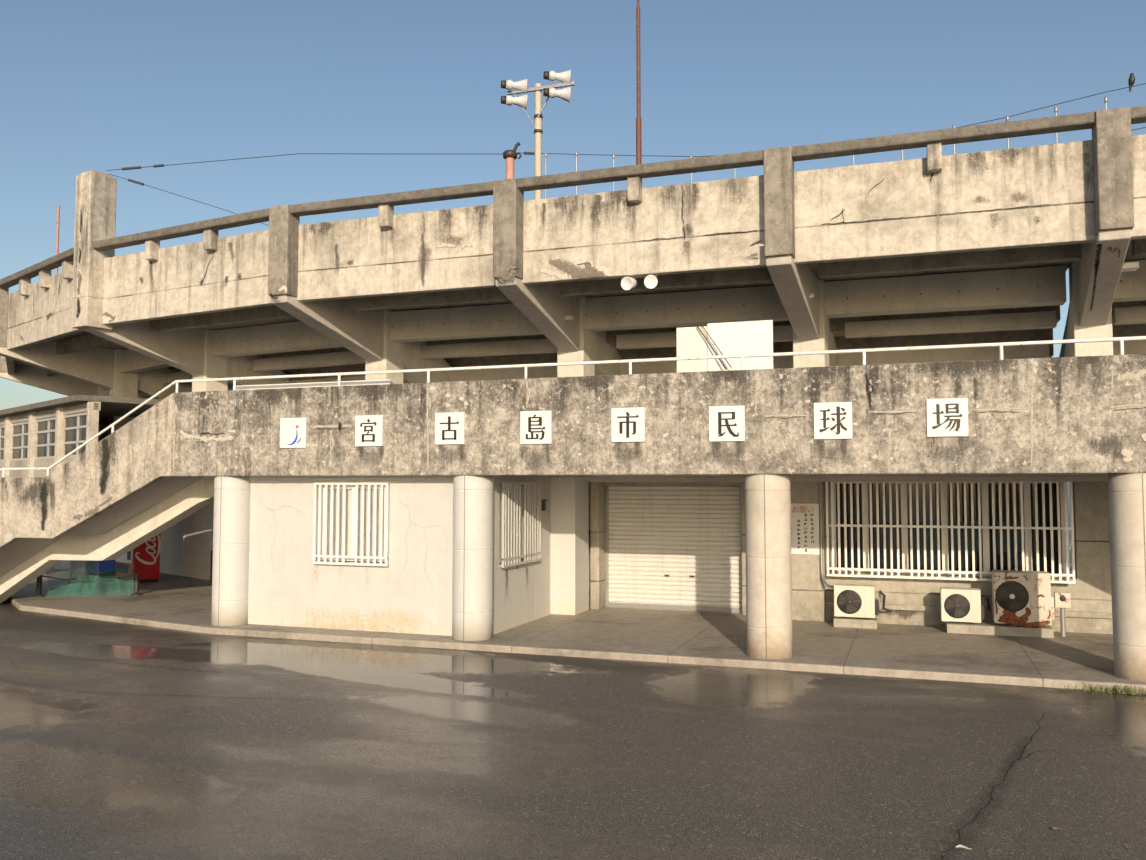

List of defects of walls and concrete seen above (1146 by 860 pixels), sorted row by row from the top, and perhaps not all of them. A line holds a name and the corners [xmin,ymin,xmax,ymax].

leakage [541,195,578,223]
leakage [591,190,631,224]
leakage [311,222,331,234]
leakage [439,209,461,245]
spalling [539,259,608,280]
leakage [98,432,115,495]
leakage [1,477,55,531]